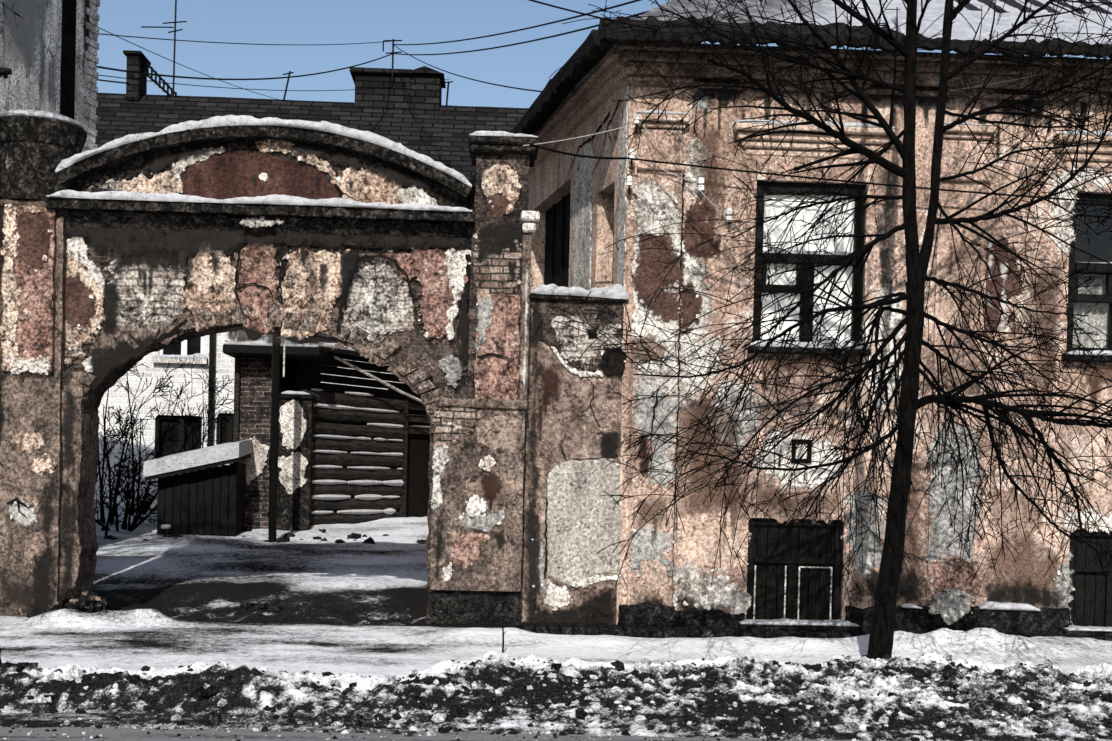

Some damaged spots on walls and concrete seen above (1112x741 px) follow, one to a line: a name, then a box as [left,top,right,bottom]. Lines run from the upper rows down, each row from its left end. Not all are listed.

flaking render [78,139,438,228]
flaking render [481,164,521,217]
flaking render [0,204,522,393]
peeling [530,86,905,578]
flaking render [19,428,57,474]
flaking render [238,400,308,494]
flaking render [431,405,523,511]
flaking render [9,496,37,526]
flaking render [442,495,505,581]
flaking render [528,525,751,615]